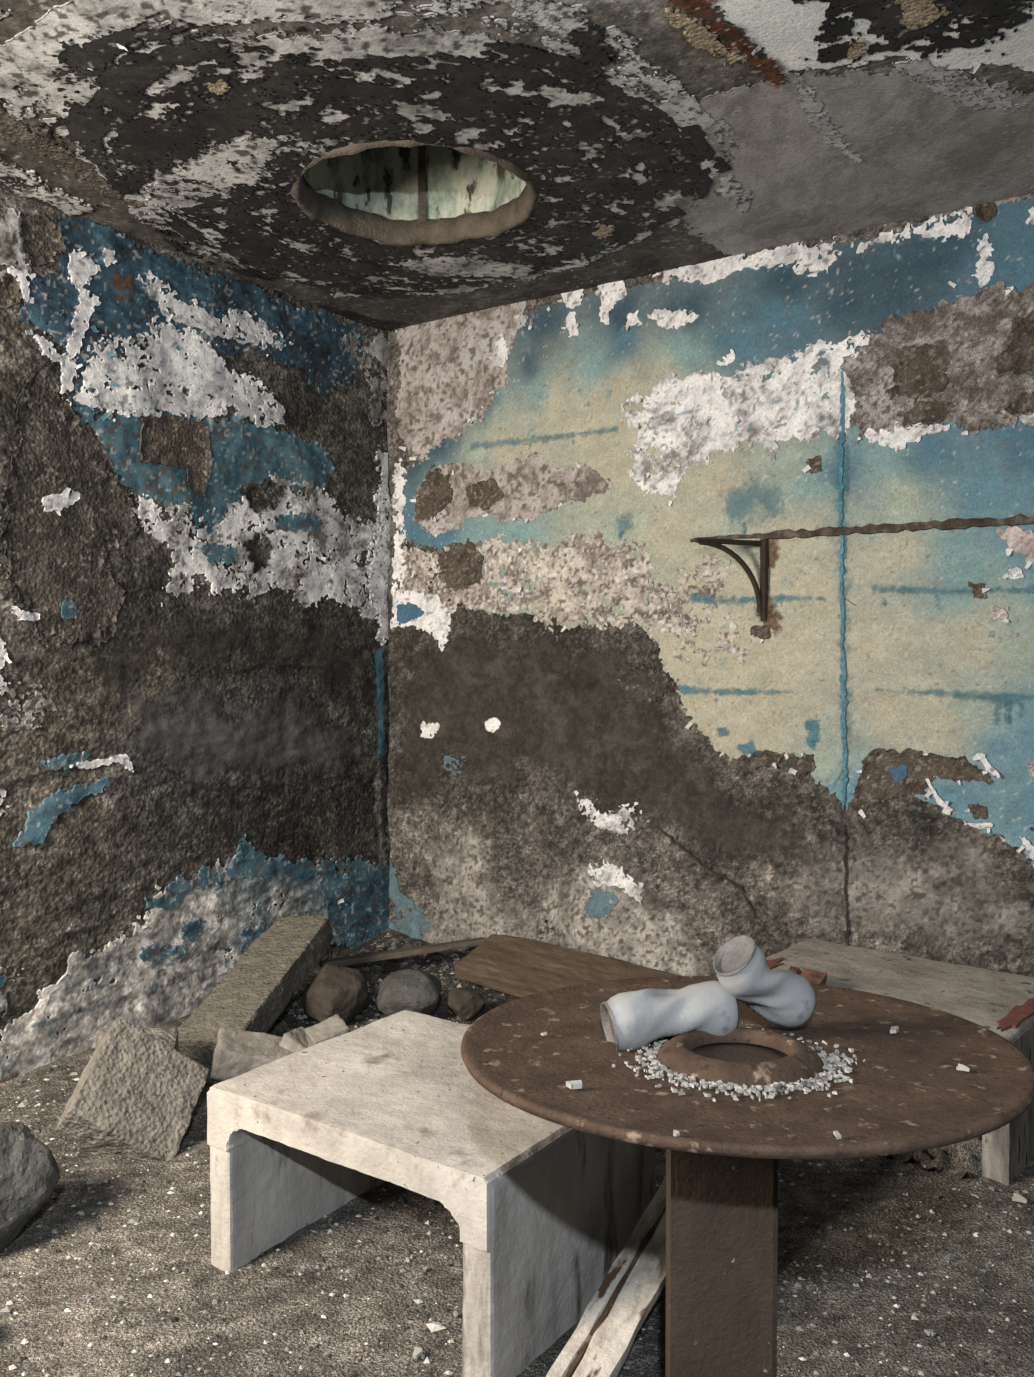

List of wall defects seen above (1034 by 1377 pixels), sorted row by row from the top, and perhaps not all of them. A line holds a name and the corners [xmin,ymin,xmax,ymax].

rust [667,0,787,85]
peeling [0,0,1034,868]
rust [768,539,778,567]
leakage [690,594,795,604]
rust [756,599,782,638]
leakage [677,685,779,701]
leakage [718,728,754,754]
leakage [805,720,819,749]
leakage [126,648,389,888]
leakage [418,825,698,976]
peeling [587,859,645,905]
peeling [0,832,440,1080]